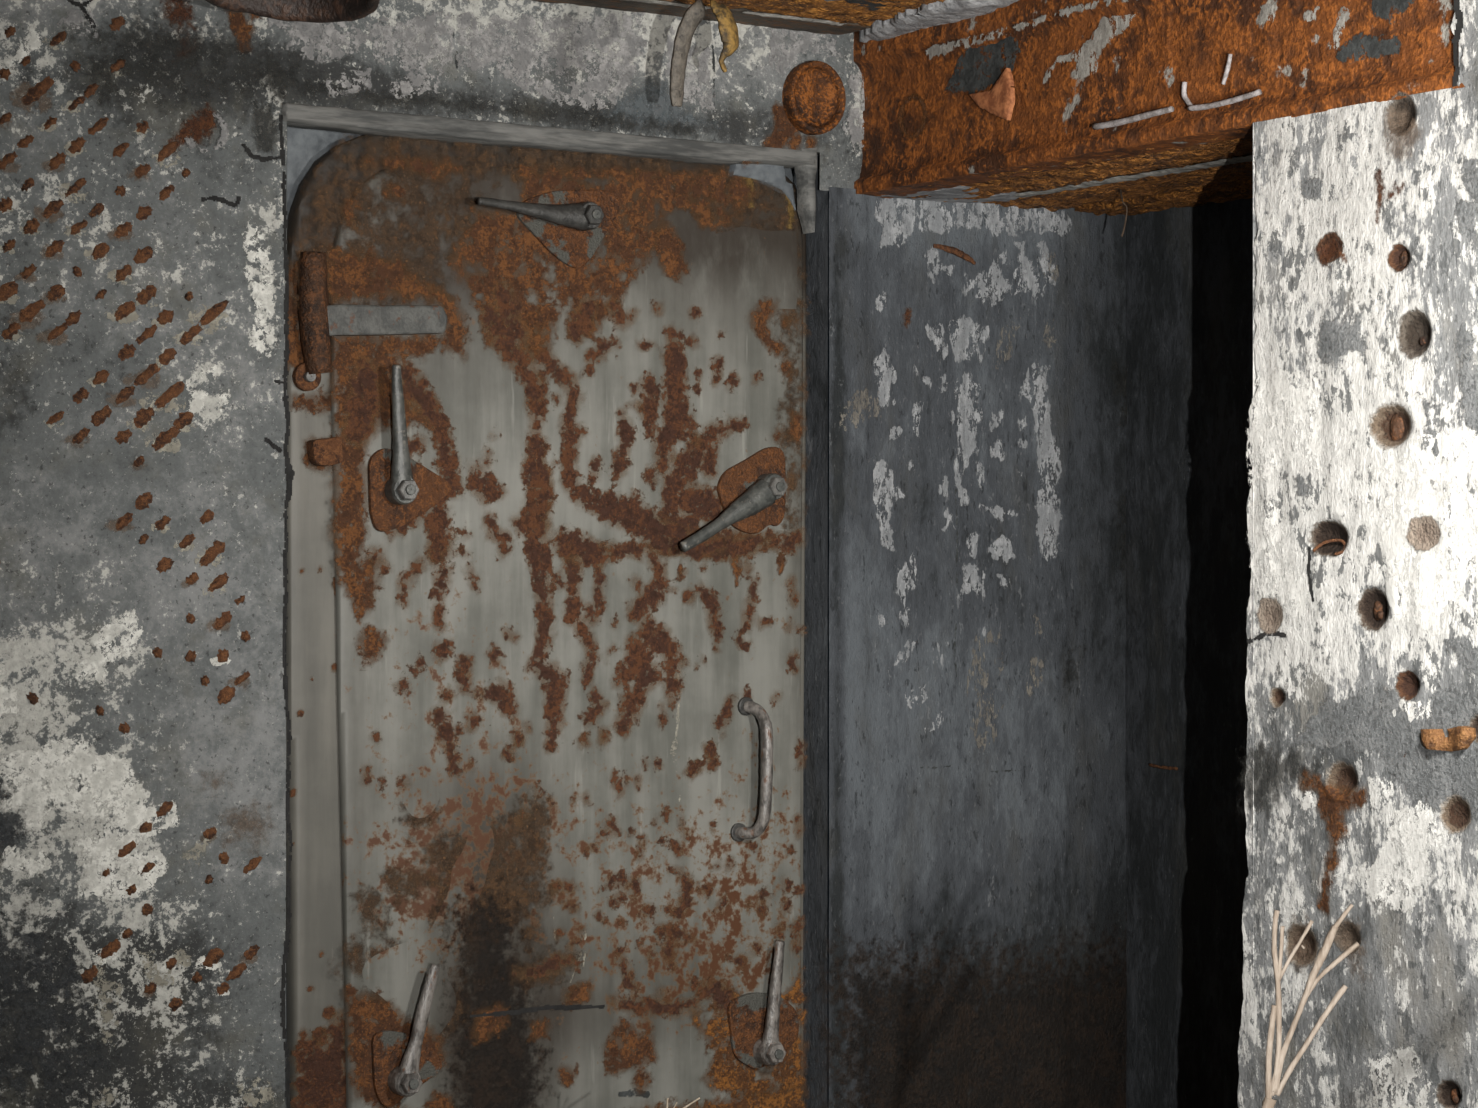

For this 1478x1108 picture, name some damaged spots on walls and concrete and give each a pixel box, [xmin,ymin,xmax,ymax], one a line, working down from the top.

crack [1452,0,1463,87]
rust [0,31,229,470]
peeling [874,198,1072,307]
rust [1374,169,1405,224]
rust [288,104,816,778]
peeling [839,315,1062,601]
rust [108,492,251,705]
peeling [868,459,917,672]
damp [0,775,27,846]
rust [290,756,807,1108]
peeling [904,684,944,733]
rust [1302,771,1366,966]